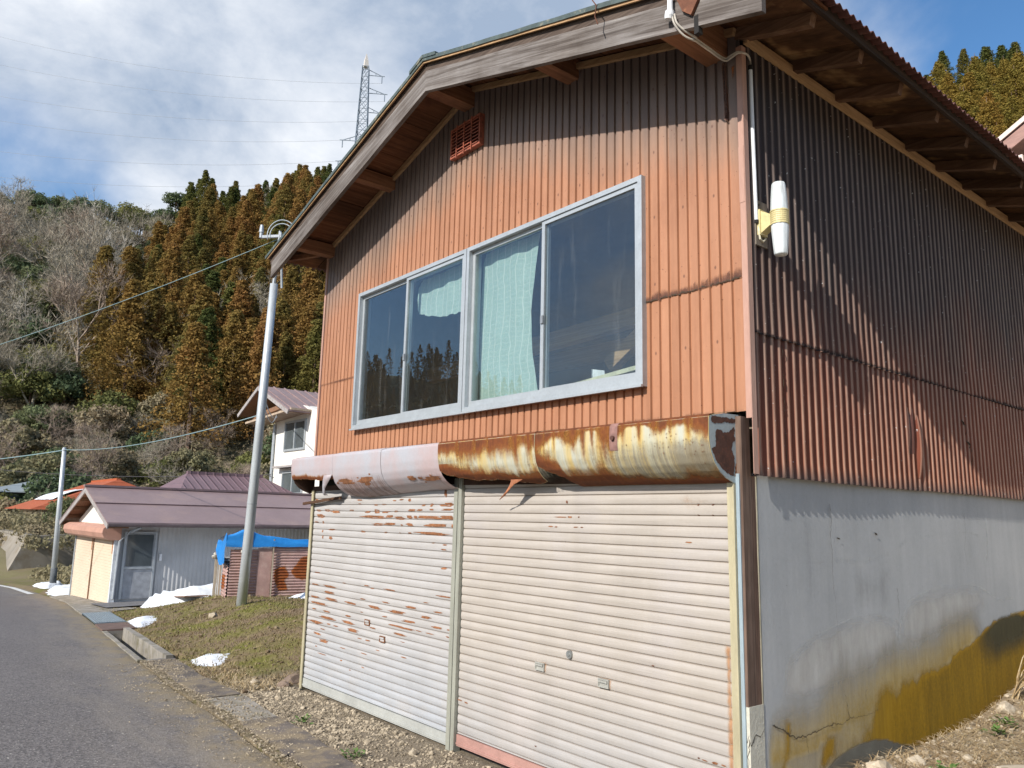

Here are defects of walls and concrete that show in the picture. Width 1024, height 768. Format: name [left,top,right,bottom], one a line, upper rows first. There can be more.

rust [438,411,732,487]
water stain [769,594,1024,768]
crack [747,689,879,768]